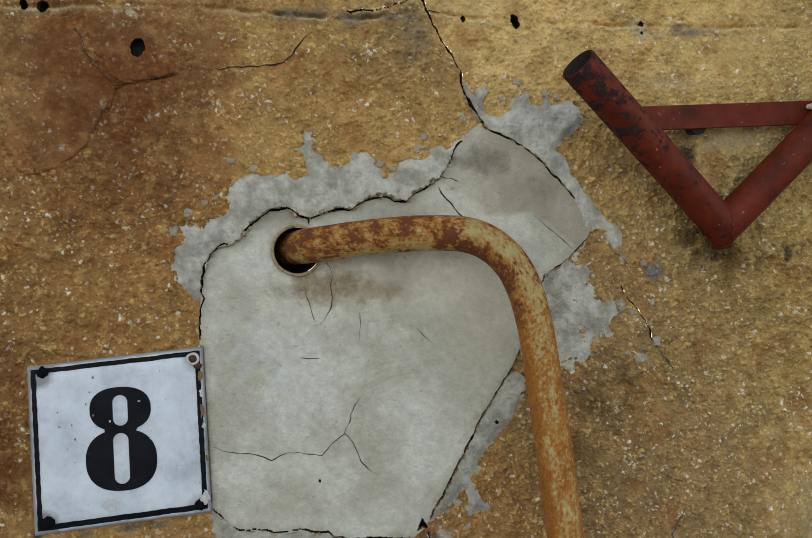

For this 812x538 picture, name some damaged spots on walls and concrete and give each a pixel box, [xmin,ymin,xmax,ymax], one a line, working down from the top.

crack [211,33,310,70]
crack [347,0,574,198]
peeling [171,129,469,301]
peeling [462,82,622,372]
crack [535,216,585,282]
crack [620,286,674,372]
peeling [198,370,206,428]
crack [213,400,378,475]
crack [423,377,506,538]
peeling [418,347,526,532]
peeling [204,490,338,538]
crack [214,510,403,538]